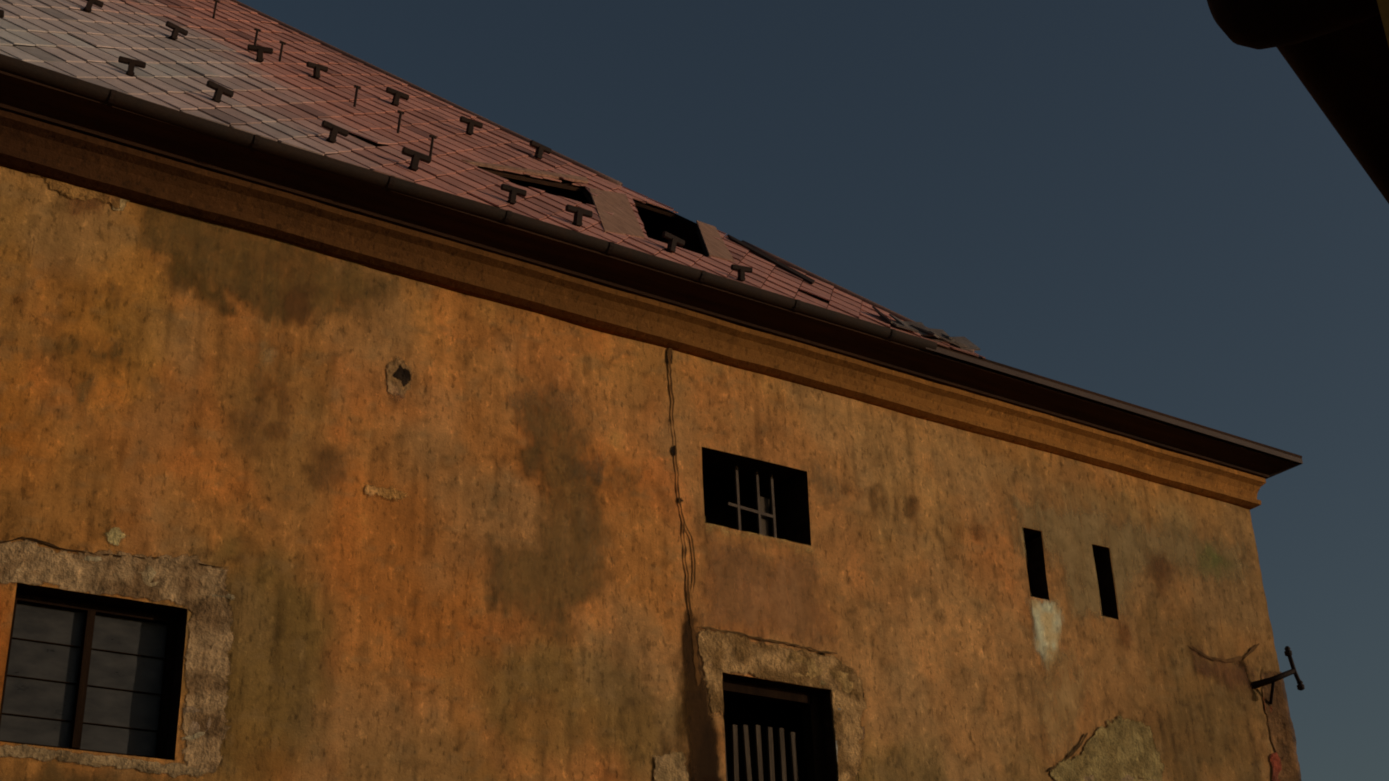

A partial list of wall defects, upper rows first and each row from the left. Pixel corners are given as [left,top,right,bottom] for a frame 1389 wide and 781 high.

leakage [489,385,603,637]
crack [666,348,701,686]
flaking render [0,527,235,778]
flaking render [654,751,689,781]
flaking render [698,626,867,781]
flaking render [1048,715,1165,781]